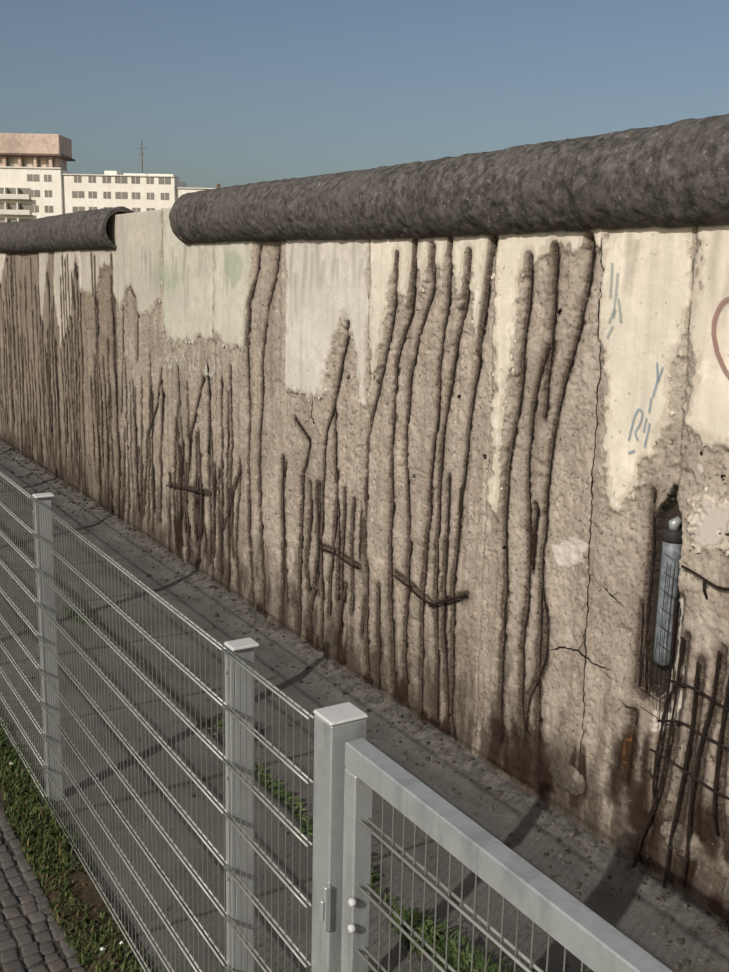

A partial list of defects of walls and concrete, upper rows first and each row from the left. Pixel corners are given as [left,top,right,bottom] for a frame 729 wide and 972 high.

spalling [0,210,729,924]
crack [549,238,622,765]
corrosion [337,632,347,665]
corrosion [610,734,669,874]
corrosion [695,805,729,862]